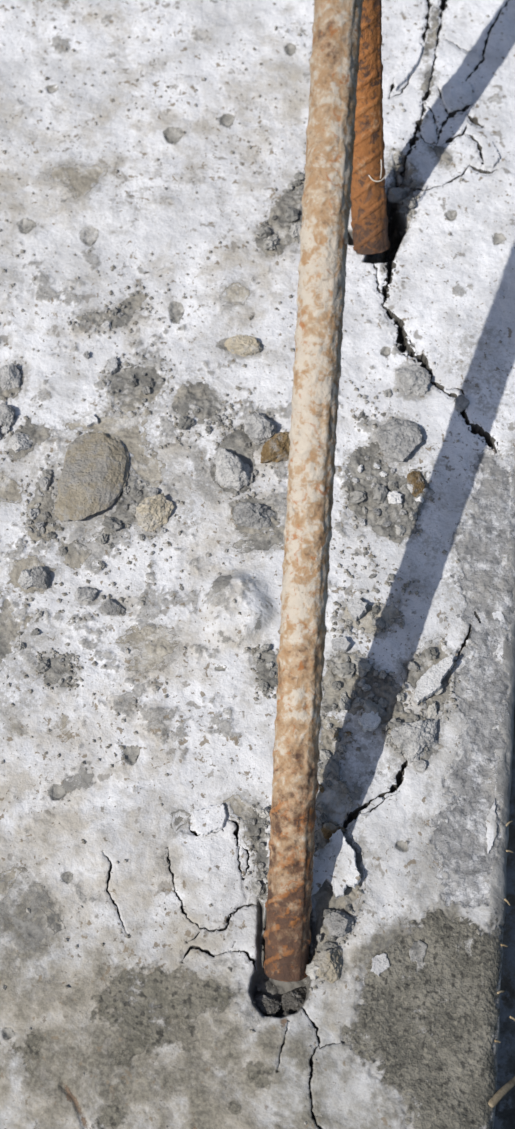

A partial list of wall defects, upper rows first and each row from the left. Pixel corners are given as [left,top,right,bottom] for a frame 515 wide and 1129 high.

crack [387,0,512,192]
crack [371,255,498,453]
spalling [170,0,515,985]
crack [454,612,480,661]
crack [342,760,410,834]
water stain [12,1032,41,1074]
water stain [92,1093,126,1129]
water stain [90,964,236,1067]
water stain [228,1101,241,1114]
water stain [246,1061,273,1088]
crack [275,1005,343,1129]
water stain [341,909,505,1129]